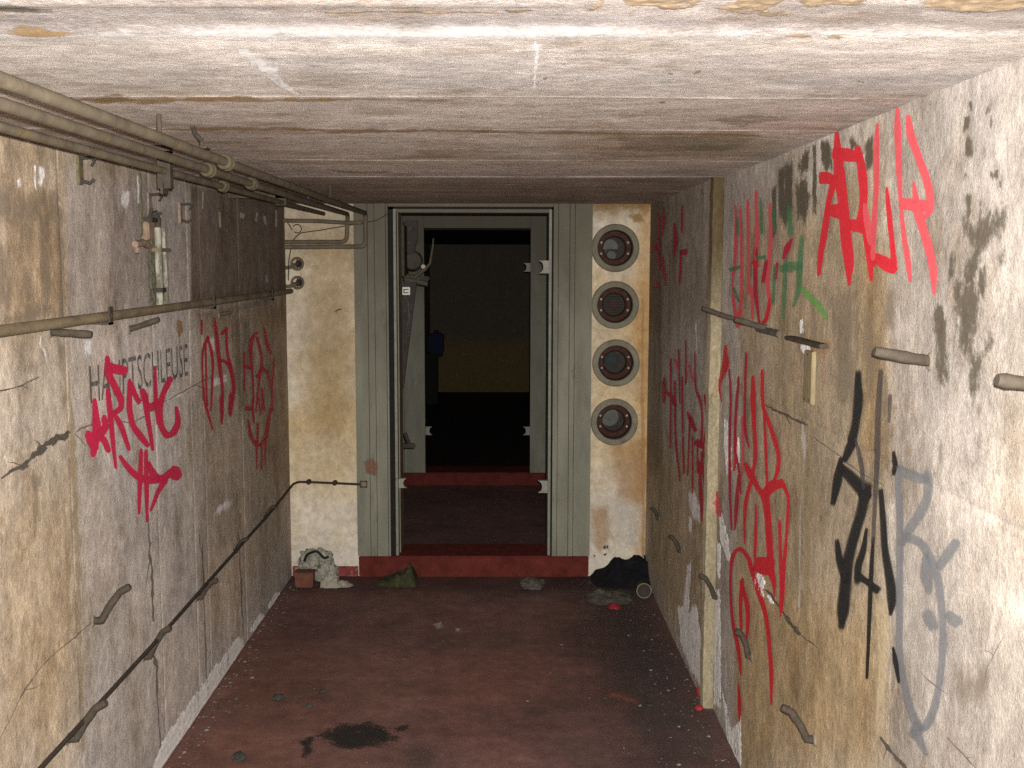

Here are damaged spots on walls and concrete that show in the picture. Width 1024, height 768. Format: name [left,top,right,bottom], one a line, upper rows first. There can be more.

damp [963,102,973,156]
damp [934,196,1005,395]
crack [122,377,211,423]
crack [1,424,92,479]